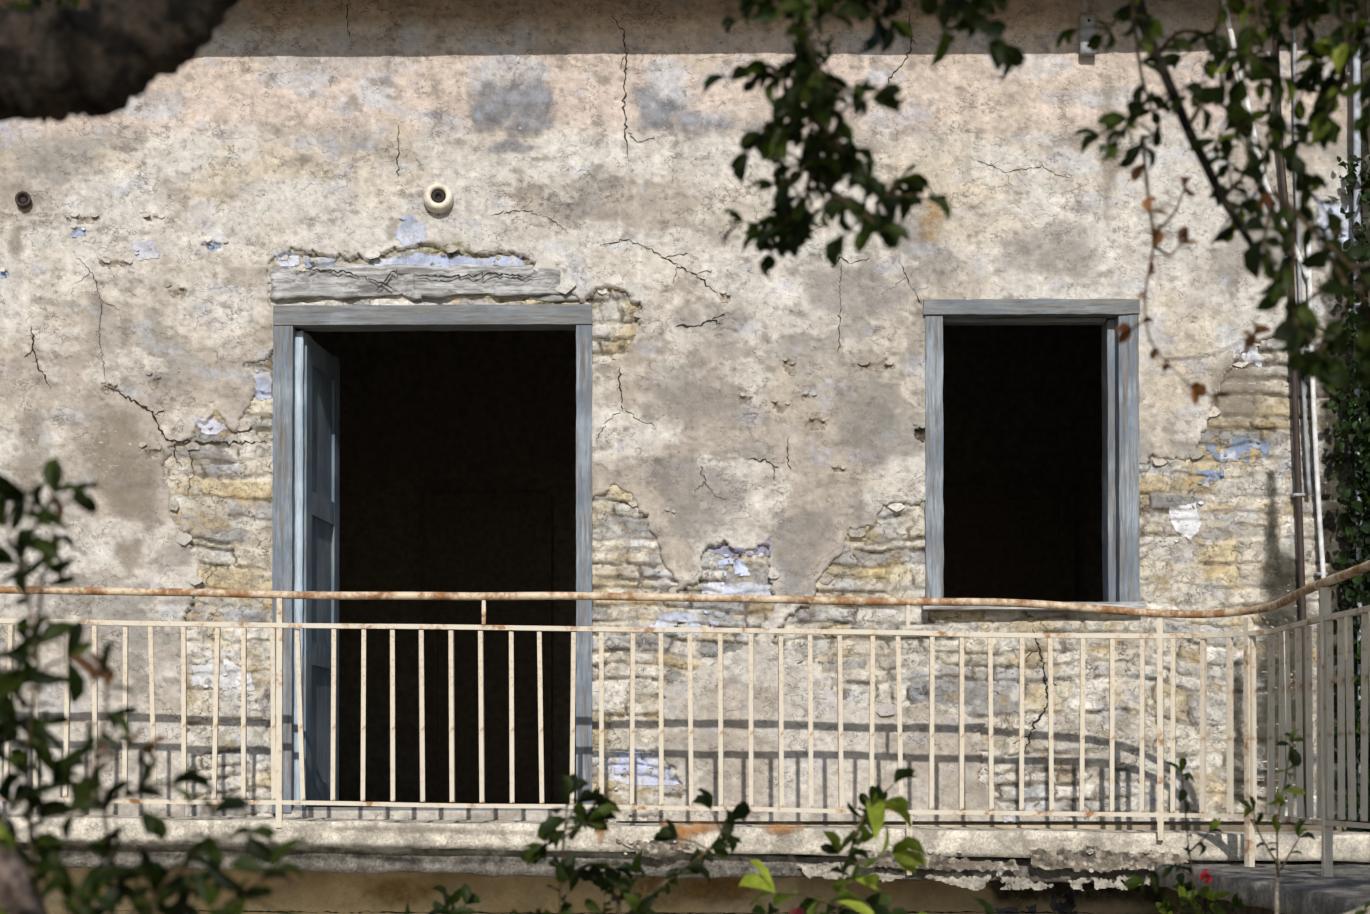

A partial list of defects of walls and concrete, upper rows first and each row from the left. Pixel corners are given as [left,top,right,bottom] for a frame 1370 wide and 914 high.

water stain [472,81,553,152]
crack [612,7,656,160]
water stain [634,88,749,130]
spalling [266,214,643,366]
crack [602,239,724,328]
crack [25,327,51,388]
crack [75,255,267,490]
spalling [139,353,275,816]
spalling [592,327,1350,859]
crack [1014,629,1056,753]
spalling [797,846,1188,914]